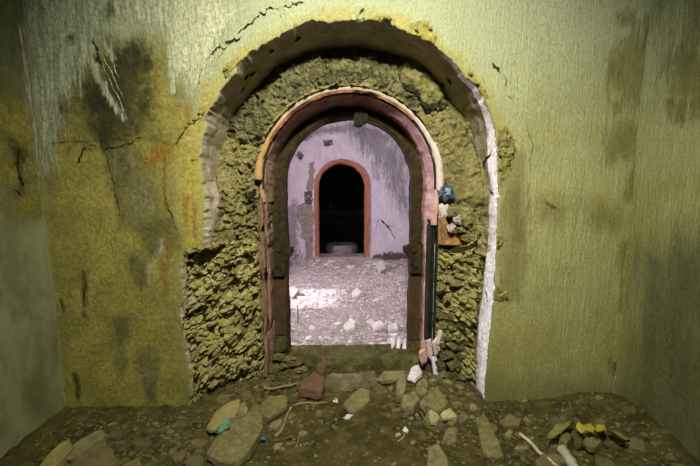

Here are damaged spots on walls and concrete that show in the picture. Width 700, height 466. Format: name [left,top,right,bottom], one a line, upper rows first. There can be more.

crack [195,0,302,89]
spalling [226,48,420,148]
crack [56,137,141,214]
damp [0,41,211,408]
crack [163,116,203,230]
spalling [288,151,315,259]
spalling [409,21,517,399]
spalling [182,237,265,403]